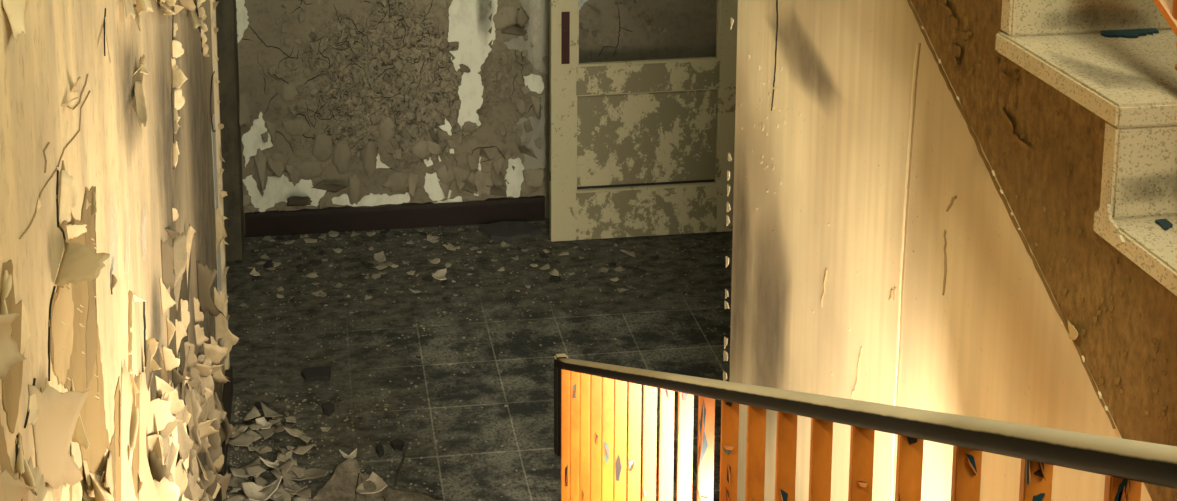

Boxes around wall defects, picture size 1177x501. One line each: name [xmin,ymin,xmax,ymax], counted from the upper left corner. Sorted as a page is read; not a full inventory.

crack [243,0,445,174]